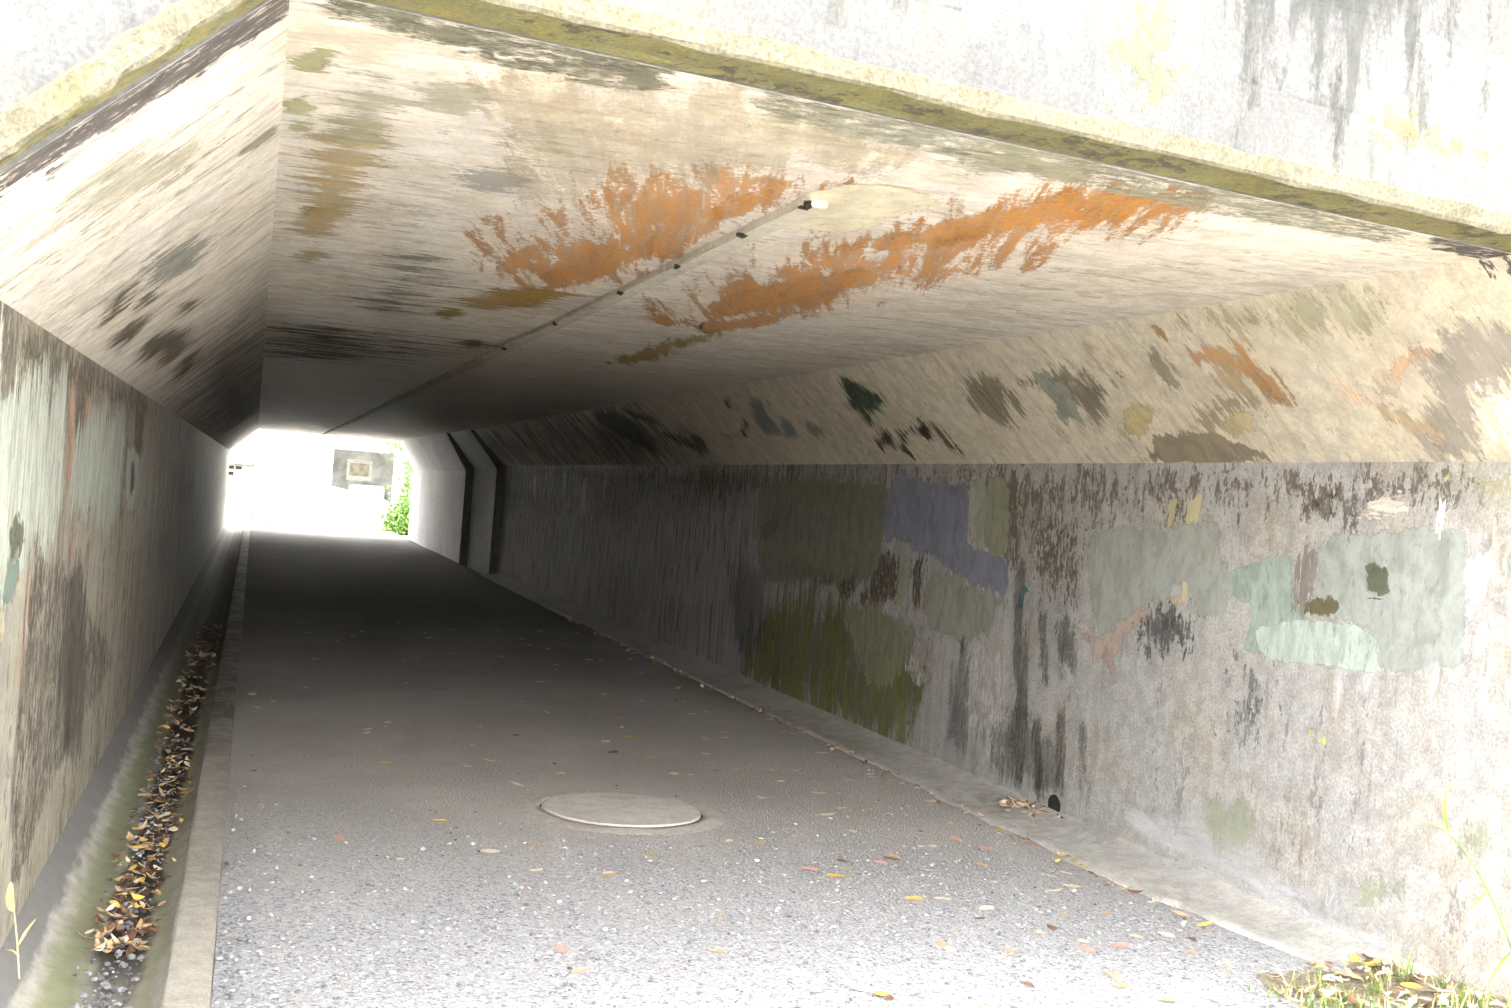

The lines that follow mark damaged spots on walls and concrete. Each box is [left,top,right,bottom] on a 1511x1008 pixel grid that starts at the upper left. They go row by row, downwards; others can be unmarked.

leakage [1238,0,1428,159]
corrosion [434,156,1218,366]
leakage [990,560,1075,797]